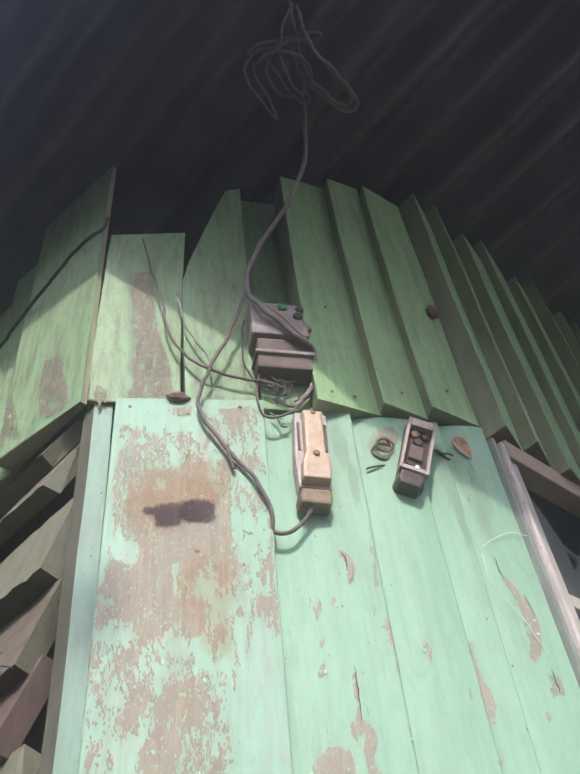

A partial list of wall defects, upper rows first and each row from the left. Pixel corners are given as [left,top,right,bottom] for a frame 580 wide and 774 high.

peeling [125,270,174,399]
peeling [0,392,19,443]
peeling [83,405,280,774]
peeling [338,550,356,585]
peeling [502,575,543,664]
peeling [310,745,356,774]
crack [354,667,369,717]
peeling [350,671,382,774]
peeling [465,633,497,725]